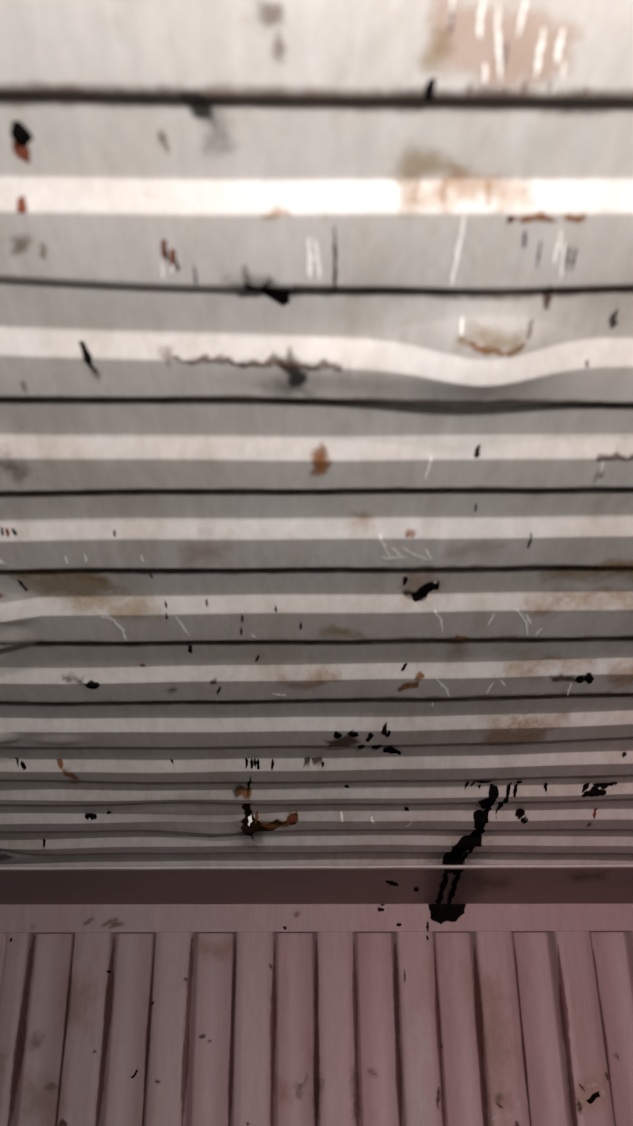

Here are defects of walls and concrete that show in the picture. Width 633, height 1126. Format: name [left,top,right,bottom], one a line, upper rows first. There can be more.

corrosion [460,315,525,356]
corrosion [0,453,633,495]
corrosion [313,447,329,474]